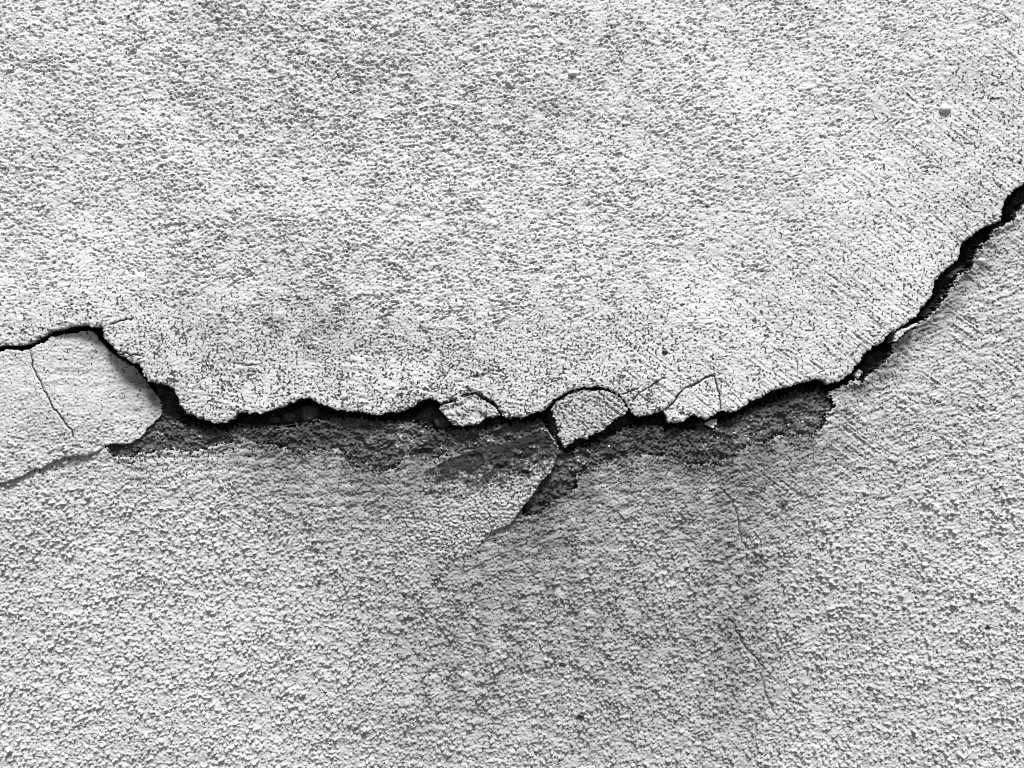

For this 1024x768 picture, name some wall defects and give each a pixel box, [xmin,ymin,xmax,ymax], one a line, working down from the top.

crack [0,346,74,437]
spalling [106,386,834,561]
crack [69,183,1024,455]